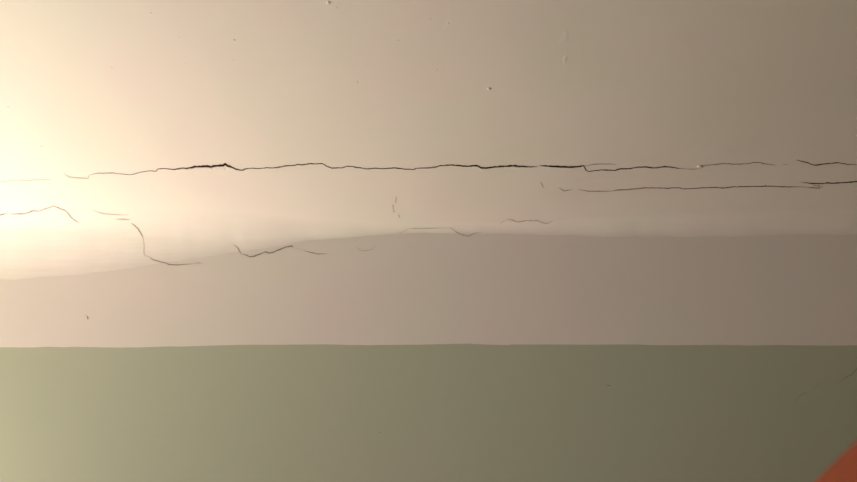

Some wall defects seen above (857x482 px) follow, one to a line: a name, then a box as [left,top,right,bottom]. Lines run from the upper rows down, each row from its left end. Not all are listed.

crack [0,160,857,192]
crack [0,206,203,265]
crack [233,244,327,257]
crack [400,218,560,237]